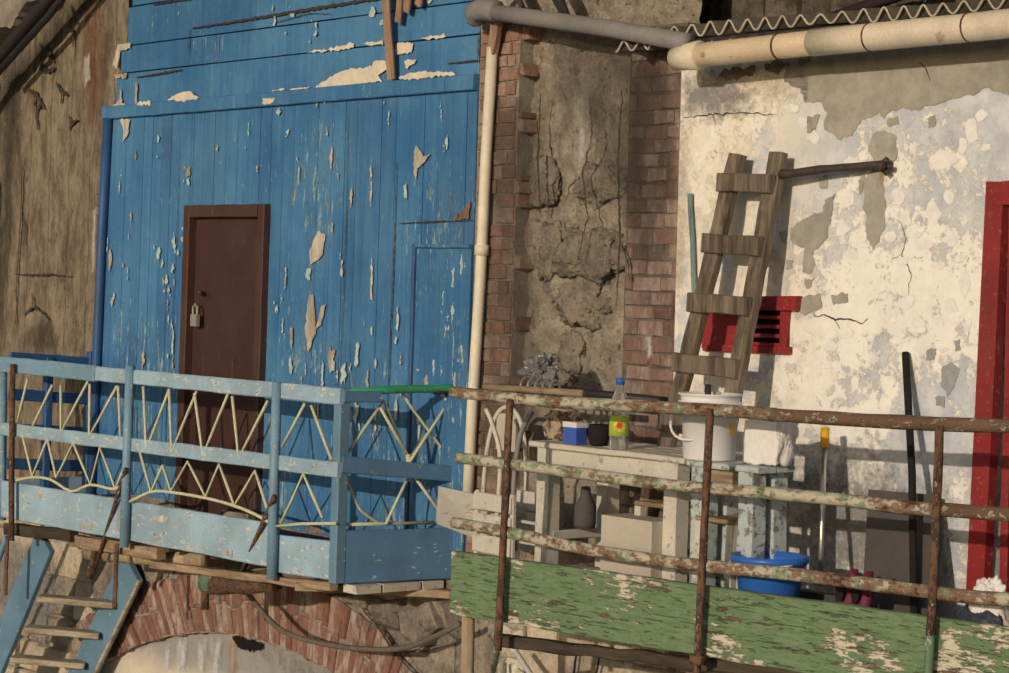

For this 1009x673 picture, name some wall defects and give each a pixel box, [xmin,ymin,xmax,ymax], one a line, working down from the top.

peeling [395,33,456,80]
peeling [168,91,199,102]
peeling [262,60,386,115]
crack [683,112,769,122]
crack [534,93,542,214]
crack [565,100,593,258]
crack [616,89,630,307]
peeling [718,38,1009,316]
peeling [305,223,333,280]
peeling [305,295,326,351]
crack [814,314,868,329]
peeling [321,342,377,387]